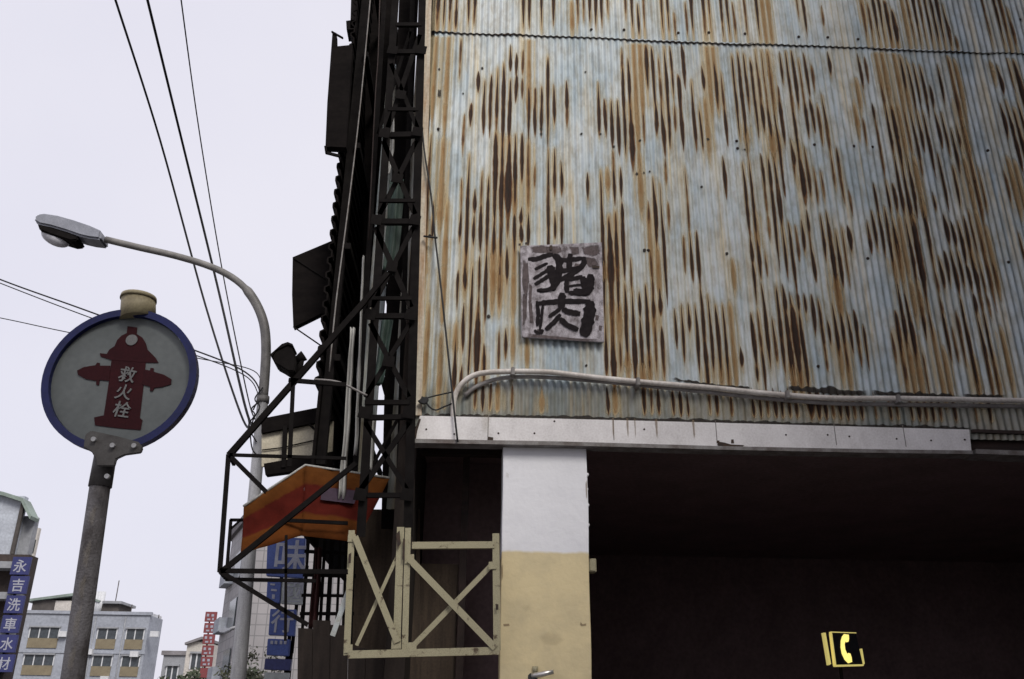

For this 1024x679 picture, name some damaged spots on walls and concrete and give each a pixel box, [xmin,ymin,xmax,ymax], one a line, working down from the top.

corrosion [422,0,1024,436]